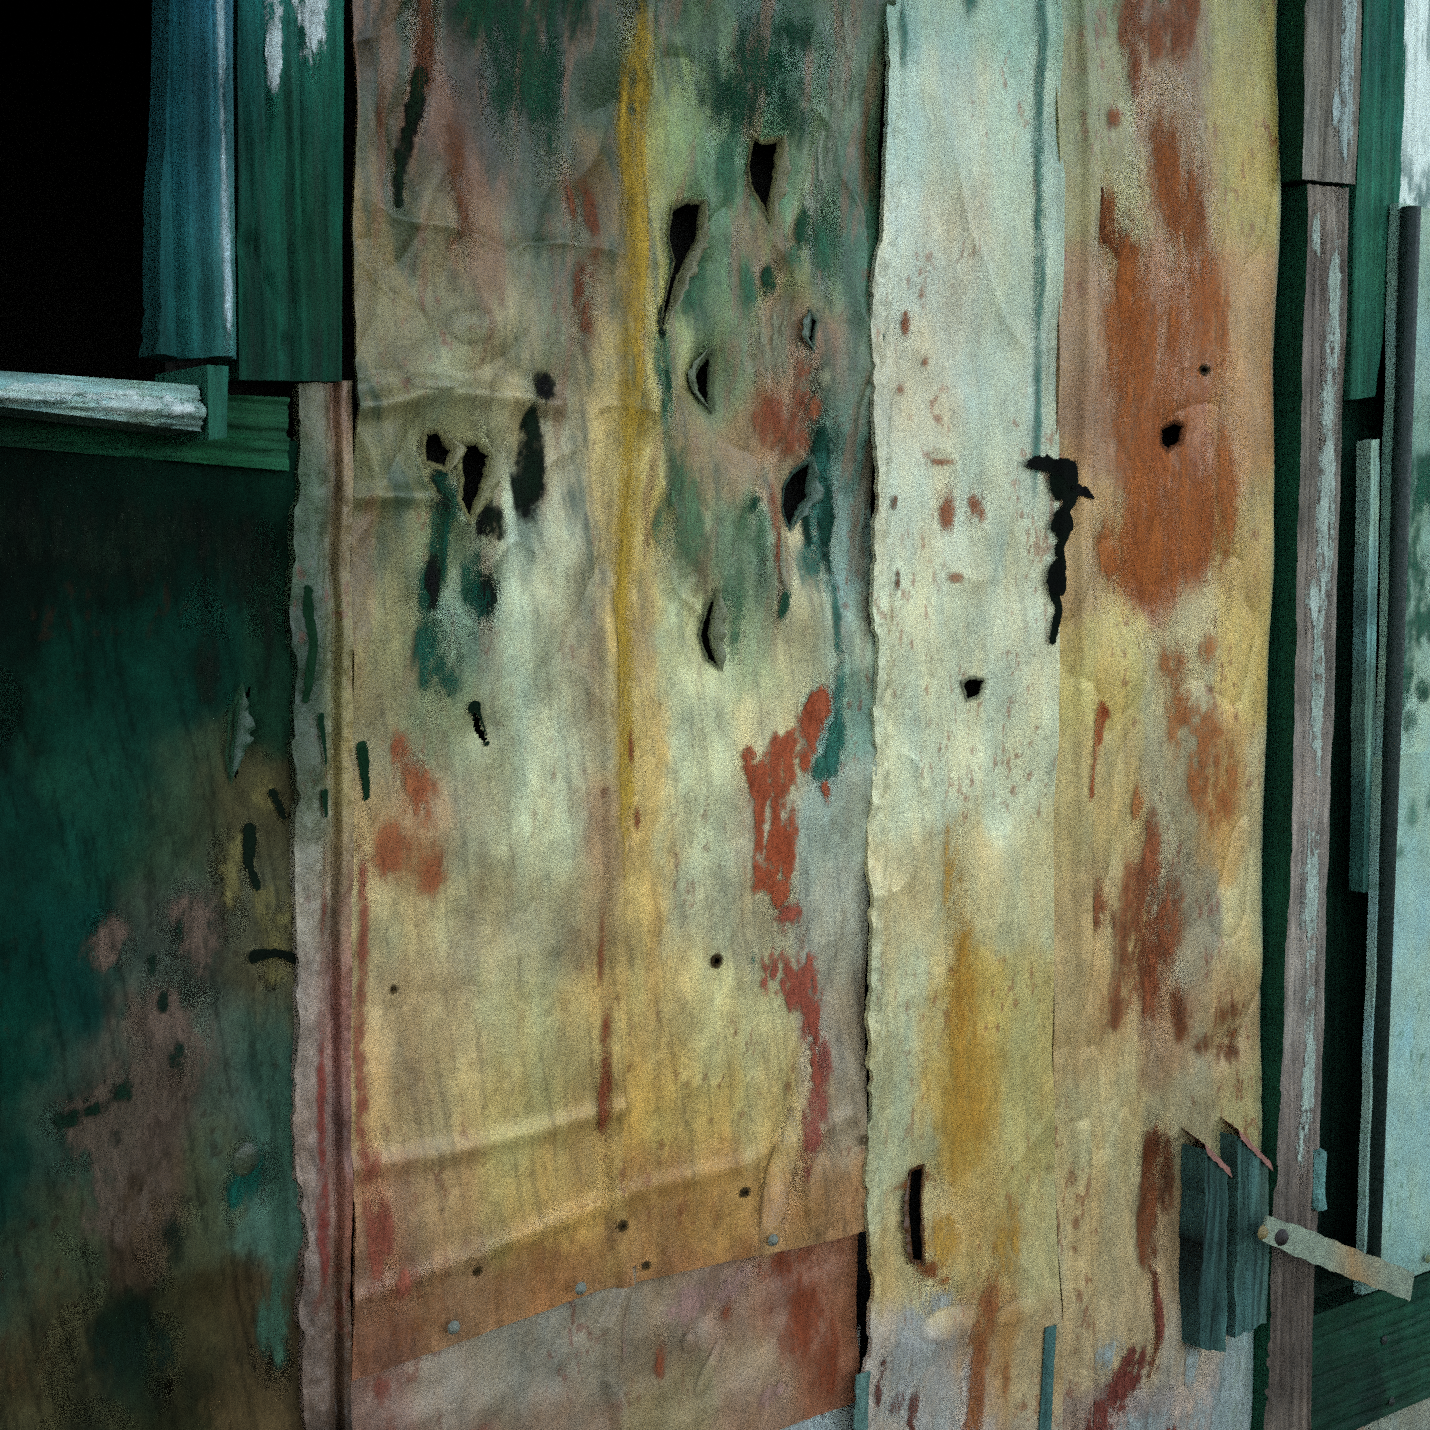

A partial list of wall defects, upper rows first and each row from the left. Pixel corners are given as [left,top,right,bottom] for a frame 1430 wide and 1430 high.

peeling [265,0,328,89]
spalling [761,265,777,295]
corrosion [1097,116,1239,611]
spalling [778,589,791,620]
spalling [802,424,835,575]
crack [1027,454,1094,645]
peeling [1402,454,1430,731]
corrosion [742,686,832,932]
corrosion [1094,786,1239,1063]
corrosion [1161,636,1238,828]
corrosion [761,947,833,1181]
corrosion [1085,1124,1175,1430]